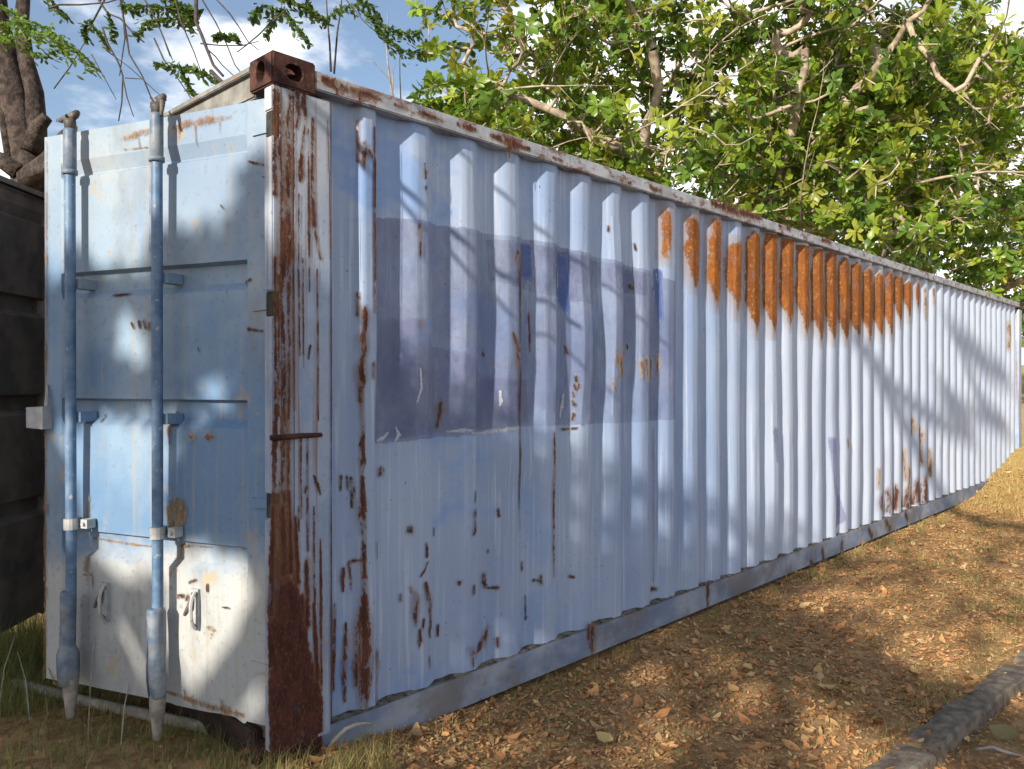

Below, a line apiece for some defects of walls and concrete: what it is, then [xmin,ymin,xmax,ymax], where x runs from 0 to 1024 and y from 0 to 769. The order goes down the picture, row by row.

rust [173,116,222,144]
rust [320,75,381,101]
rust [489,133,530,159]
rust [660,199,935,341]
rust [267,87,379,765]
rust [878,418,933,513]
rust [413,561,439,647]
rust [470,629,499,667]